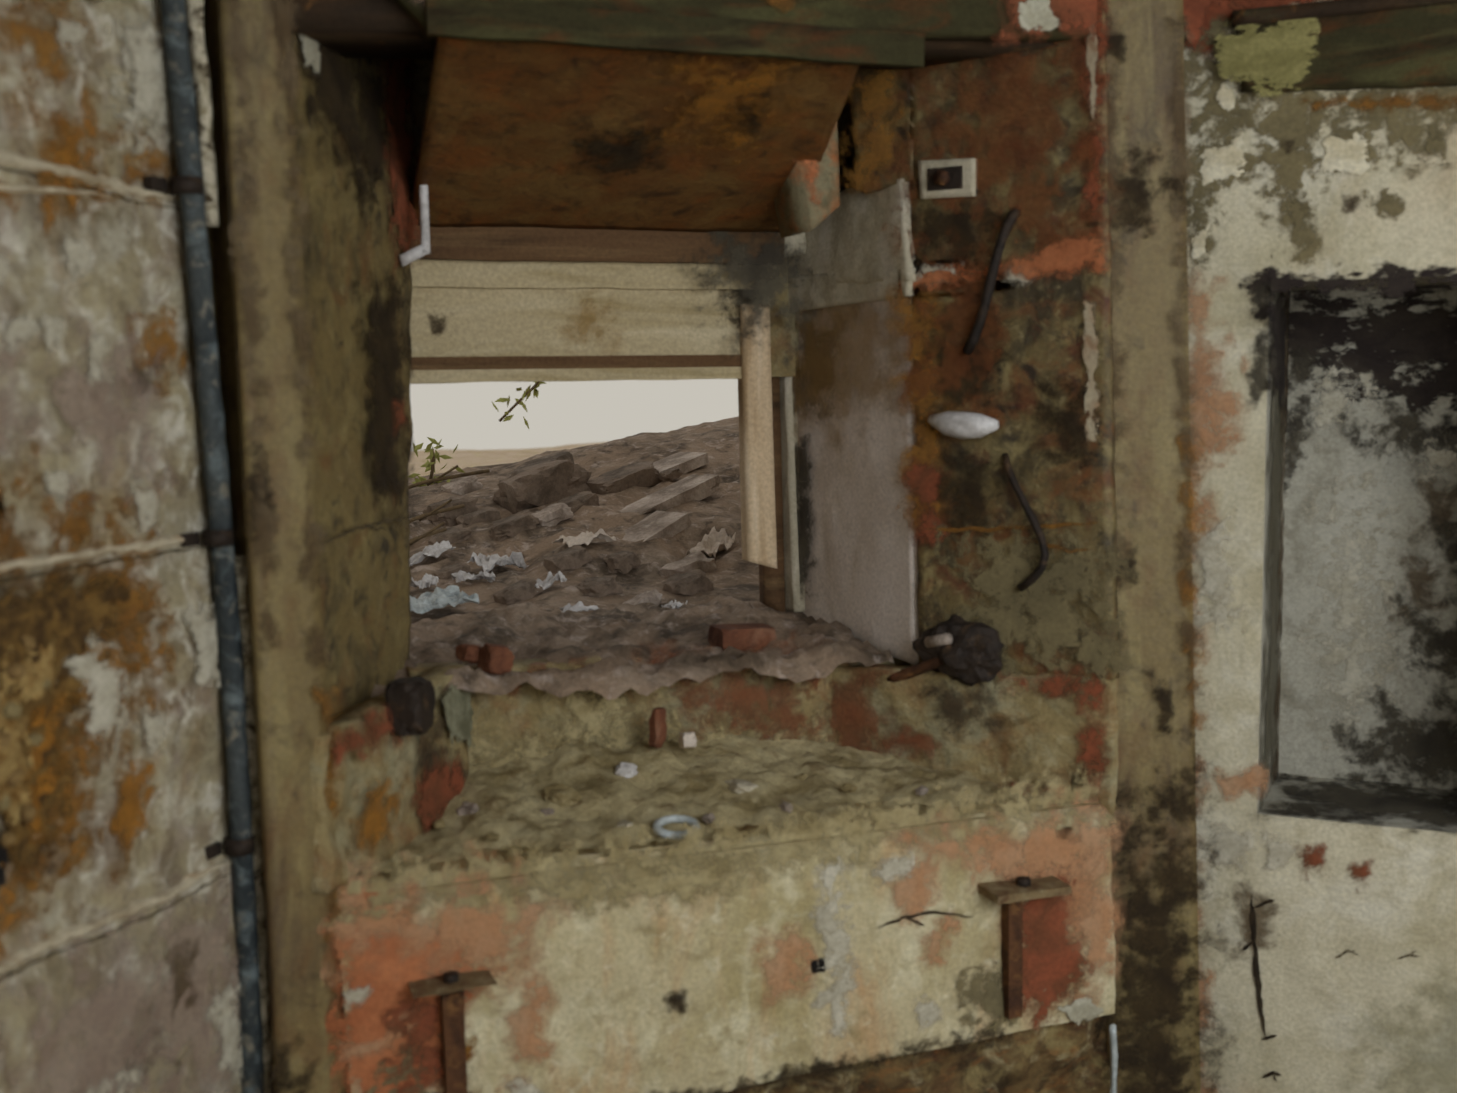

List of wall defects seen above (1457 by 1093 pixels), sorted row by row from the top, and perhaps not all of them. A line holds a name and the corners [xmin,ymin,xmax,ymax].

peeling [108,13,174,154]
peeling [998,0,1109,221]
flaking render [1199,131,1248,186]
peeling [1183,0,1320,111]
water stain [1184,17,1457,267]
water stain [356,268,414,538]
water stain [1247,282,1277,404]
spalling [0,570,167,887]
corrosion [0,445,176,911]
peeling [185,603,221,696]
peeling [319,855,546,1093]
peeling [674,782,1120,1093]